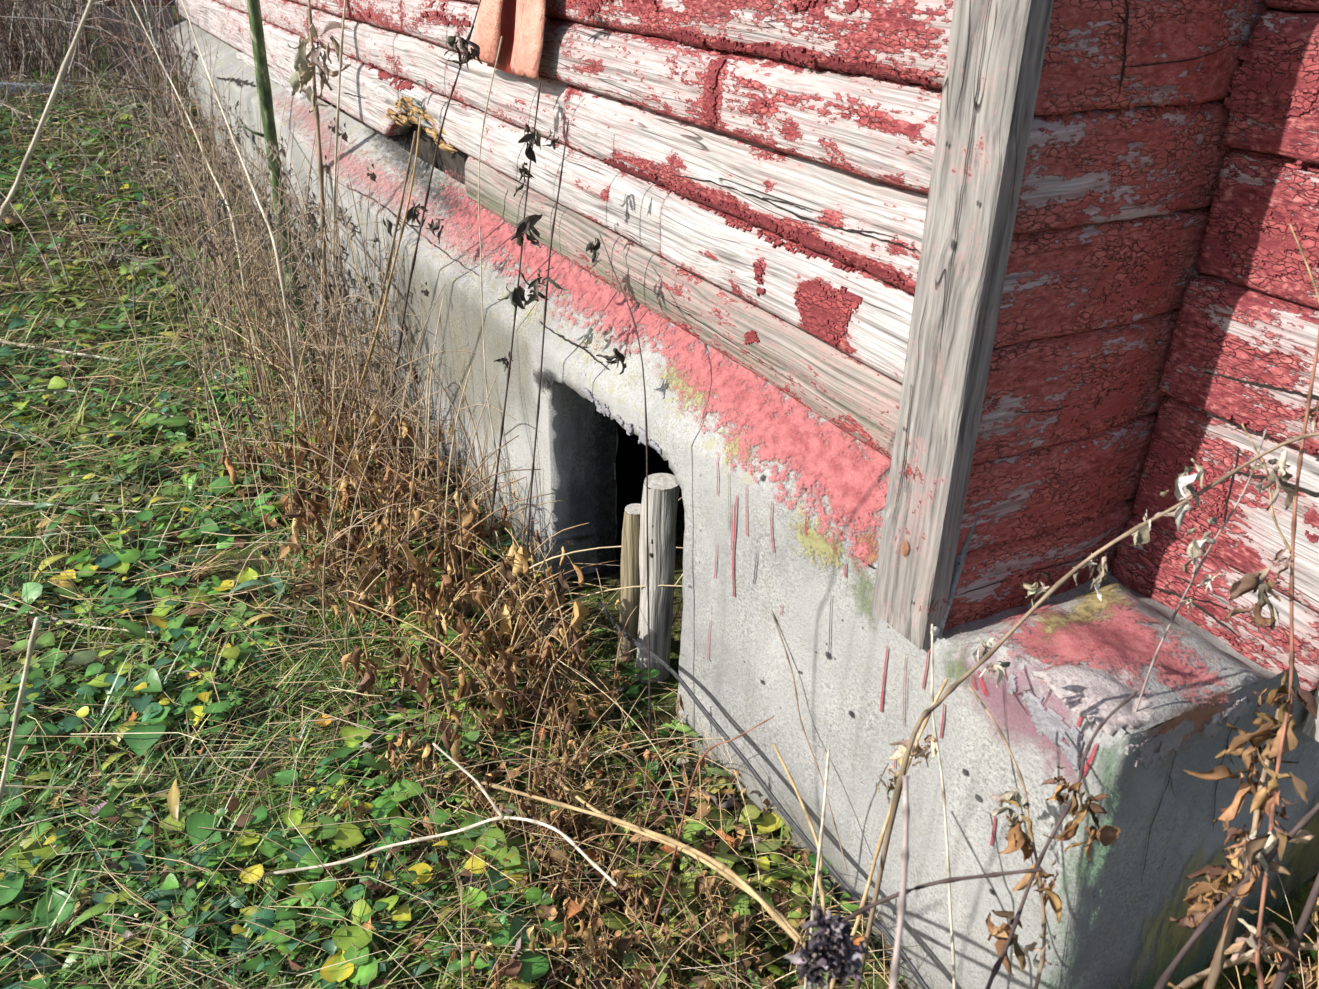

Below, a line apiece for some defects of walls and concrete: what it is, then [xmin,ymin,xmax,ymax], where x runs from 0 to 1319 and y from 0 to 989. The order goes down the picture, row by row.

peeling [368,62,414,91]
peeling [670,30,930,124]
crack [1118,0,1224,93]
crack [941,0,990,338]
peeling [603,157,916,347]
crack [676,175,918,251]
peeling [1204,207,1319,277]
spalling [583,388,662,455]
crack [1013,405,1069,413]
peeling [1144,436,1229,519]
crack [958,557,1088,596]
peeling [980,562,1099,620]